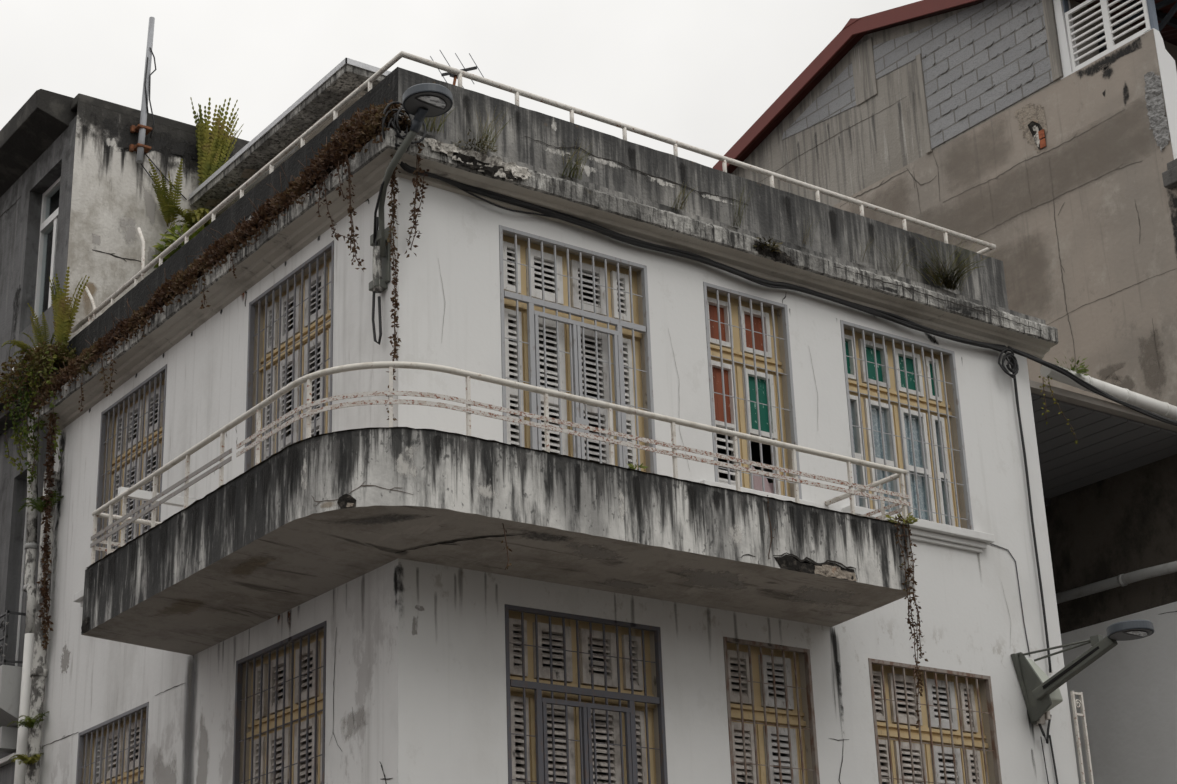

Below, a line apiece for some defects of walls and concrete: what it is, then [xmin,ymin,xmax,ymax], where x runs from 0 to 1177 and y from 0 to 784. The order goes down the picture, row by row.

damp [82,117,198,181]
damp [581,157,617,176]
damp [651,163,686,188]
crack [92,249,141,262]
damp [397,447,416,476]
damp [131,448,307,568]
crack [312,485,413,506]
spalling [773,552,857,581]
damp [394,567,404,603]
damp [183,656,197,784]